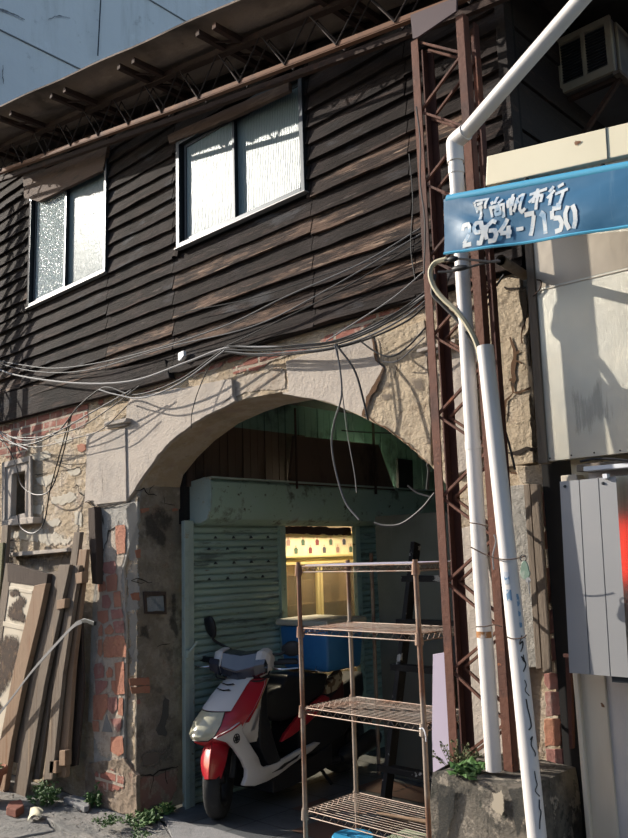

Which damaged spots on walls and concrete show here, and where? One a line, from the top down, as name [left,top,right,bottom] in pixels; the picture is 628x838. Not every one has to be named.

peeling [11,518,71,546]
peeling [35,474,55,487]
flaking render [0,398,104,461]
peeling [33,492,77,515]
crack [361,336,428,464]
crack [505,323,531,415]
crack [508,446,537,475]
flaking render [92,503,150,792]